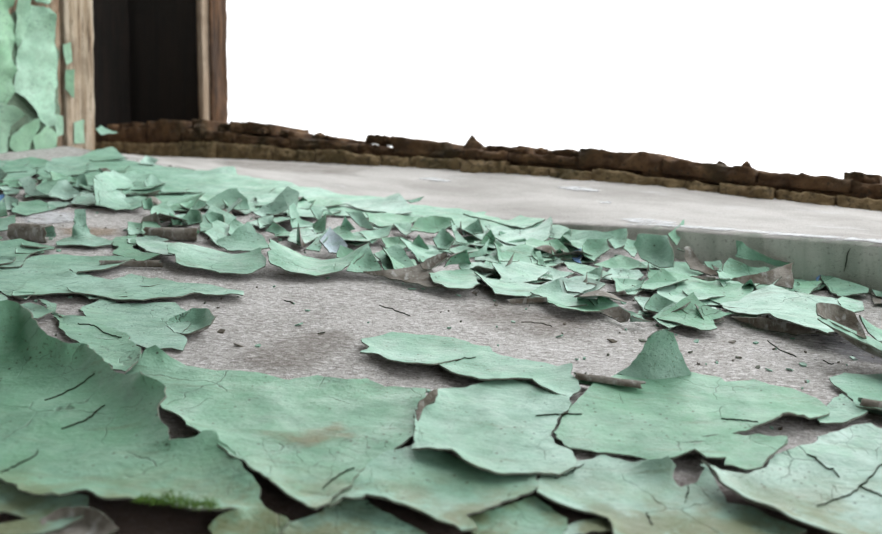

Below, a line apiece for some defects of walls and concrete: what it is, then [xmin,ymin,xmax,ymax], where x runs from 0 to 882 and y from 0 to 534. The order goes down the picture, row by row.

peeling [0,0,75,153]
peeling [74,119,85,144]
crack [78,323,122,338]
peeling [0,147,882,534]
crack [44,373,95,401]
crack [61,404,105,429]
crack [1,449,38,473]
crack [807,454,882,506]